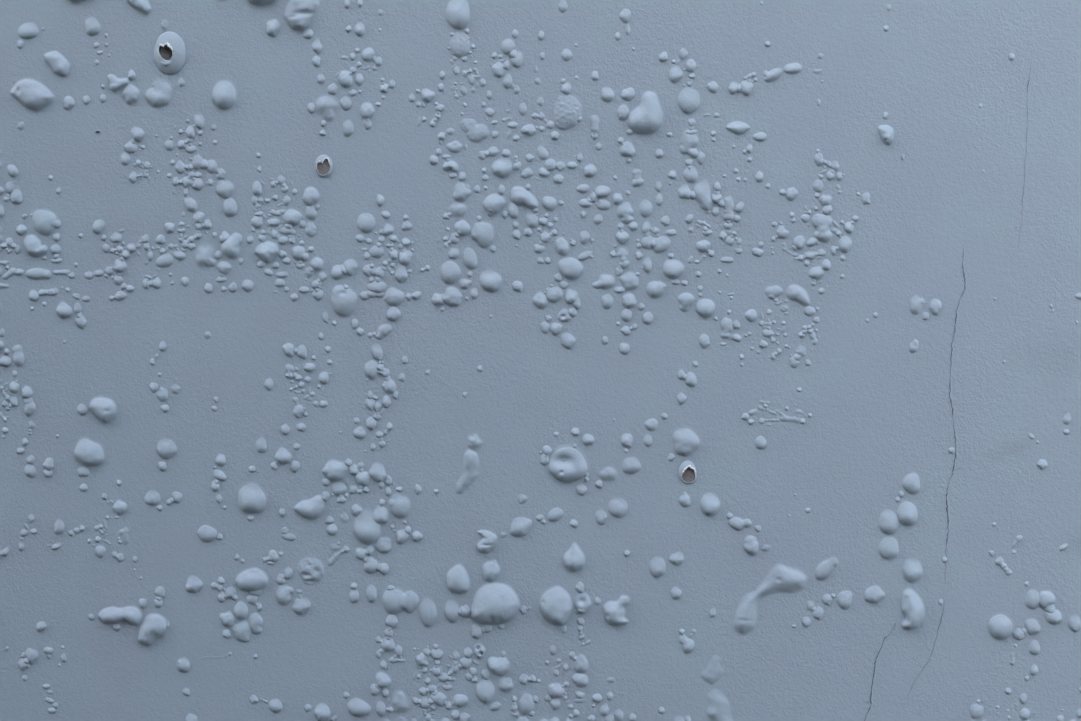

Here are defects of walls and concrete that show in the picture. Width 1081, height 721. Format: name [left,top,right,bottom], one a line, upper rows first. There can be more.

crack [1017,56,1033,257]
crack [906,243,968,694]
crack [863,623,896,721]